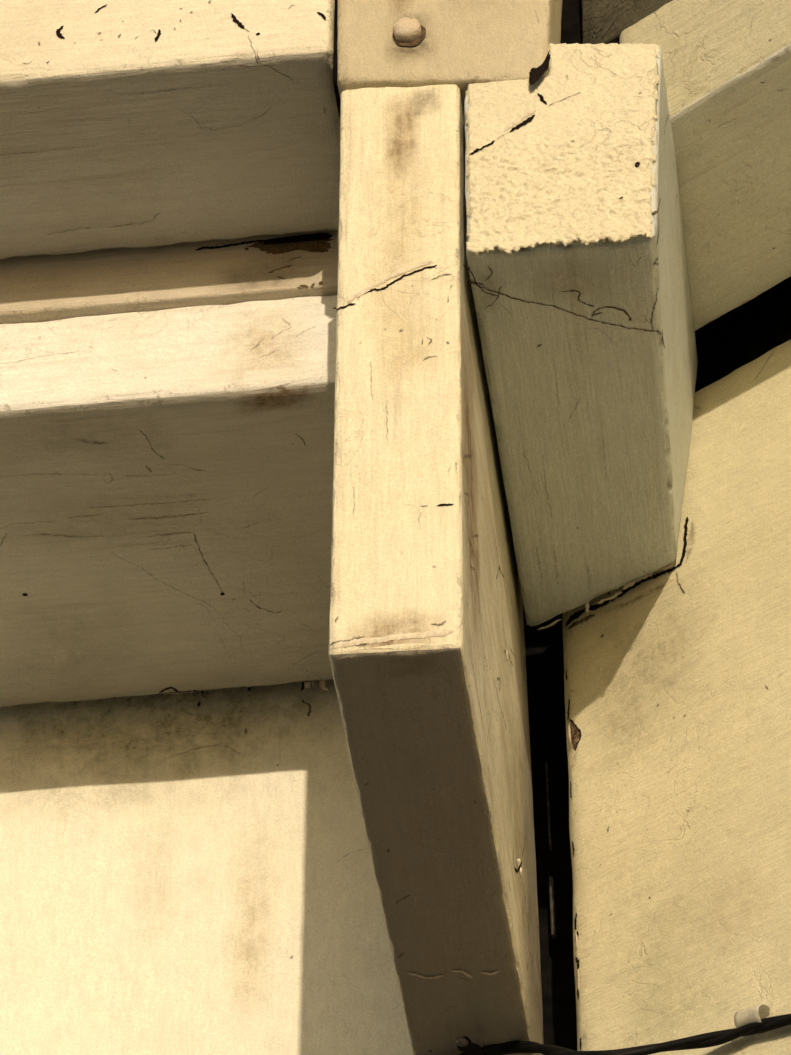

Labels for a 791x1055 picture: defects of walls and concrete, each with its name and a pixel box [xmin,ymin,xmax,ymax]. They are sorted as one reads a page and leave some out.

spalling [529,50,551,105]
crack [332,261,665,349]
leakage [256,387,293,407]
leakage [100,691,241,740]